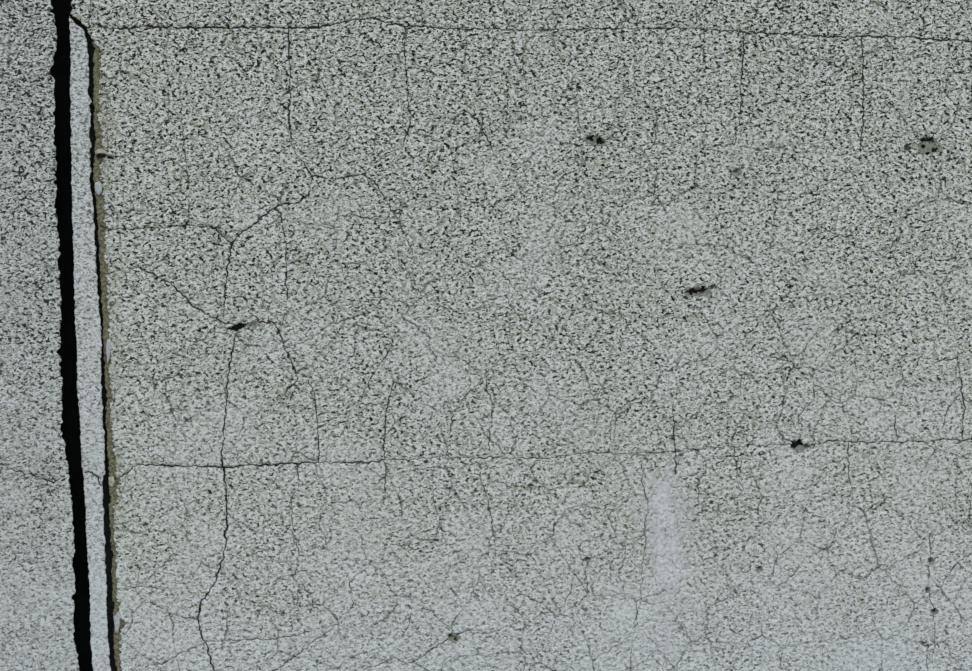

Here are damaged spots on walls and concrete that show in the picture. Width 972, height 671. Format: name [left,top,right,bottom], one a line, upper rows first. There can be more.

crack [516,9,972,151]
crack [629,143,663,207]
crack [0,455,64,483]
crack [70,0,512,671]
crack [499,271,552,341]
crack [511,383,788,671]
crack [766,355,841,425]
crack [808,357,972,502]